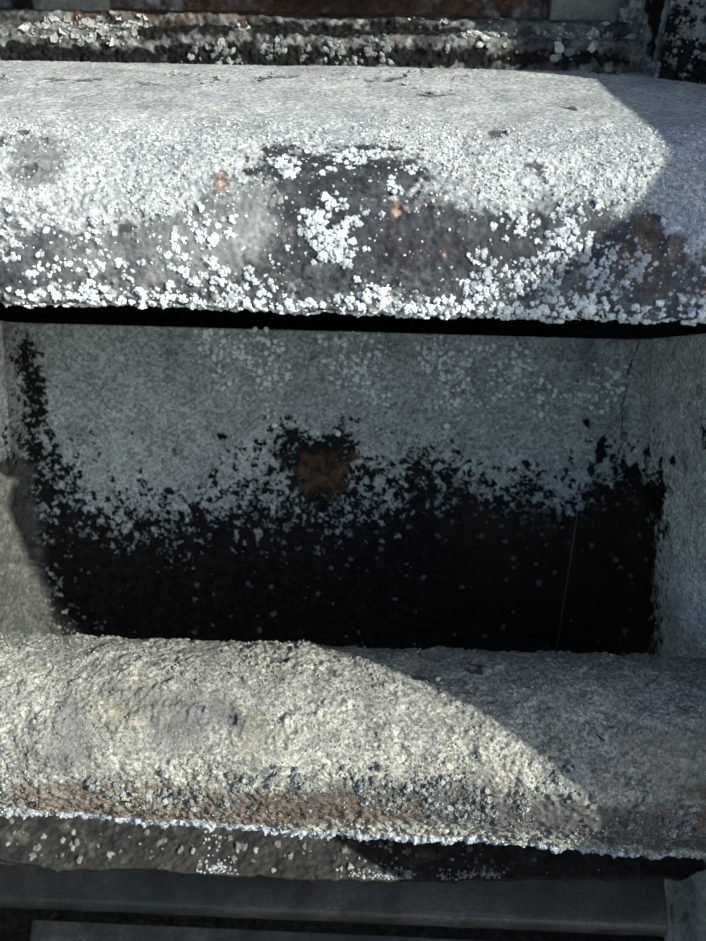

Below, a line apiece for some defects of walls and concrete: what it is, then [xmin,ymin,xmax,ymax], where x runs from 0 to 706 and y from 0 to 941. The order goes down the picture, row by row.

leakage [669,11,706,61]
leakage [0,136,706,326]
rust [617,216,660,284]
leakage [0,452,61,636]